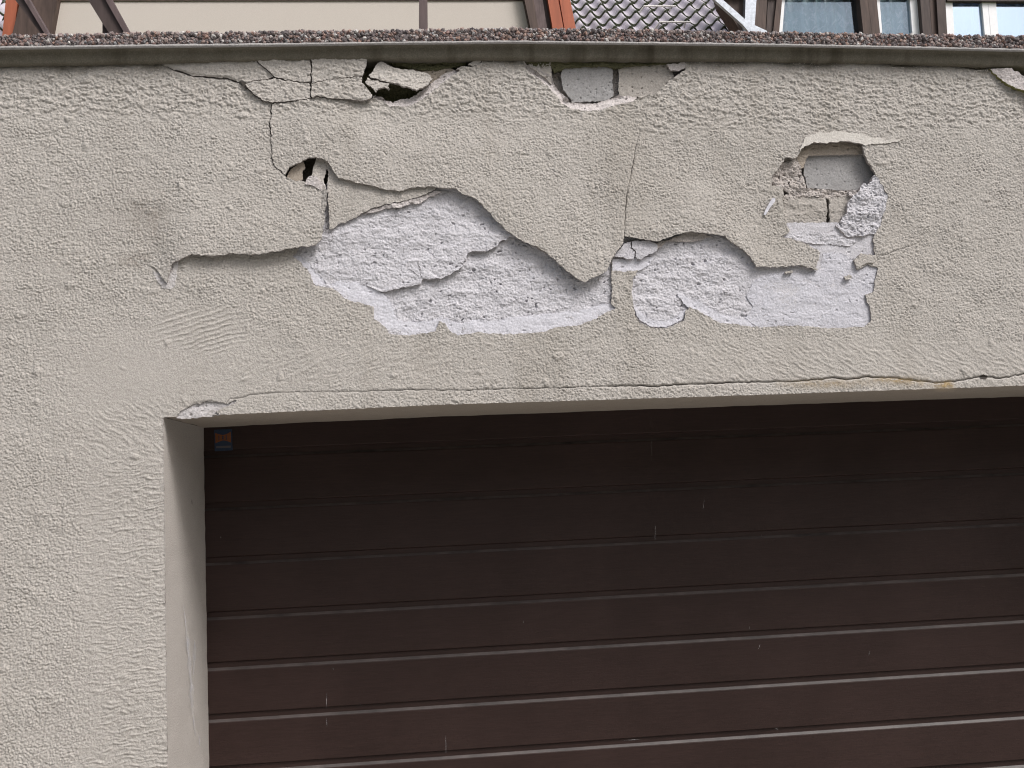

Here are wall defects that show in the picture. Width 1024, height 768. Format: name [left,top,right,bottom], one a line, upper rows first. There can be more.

spalling [362,61,481,107]
spalling [525,62,686,111]
crack [168,62,363,175]
spalling [284,131,902,335]
crack [438,373,1024,391]
peeling [176,400,237,419]